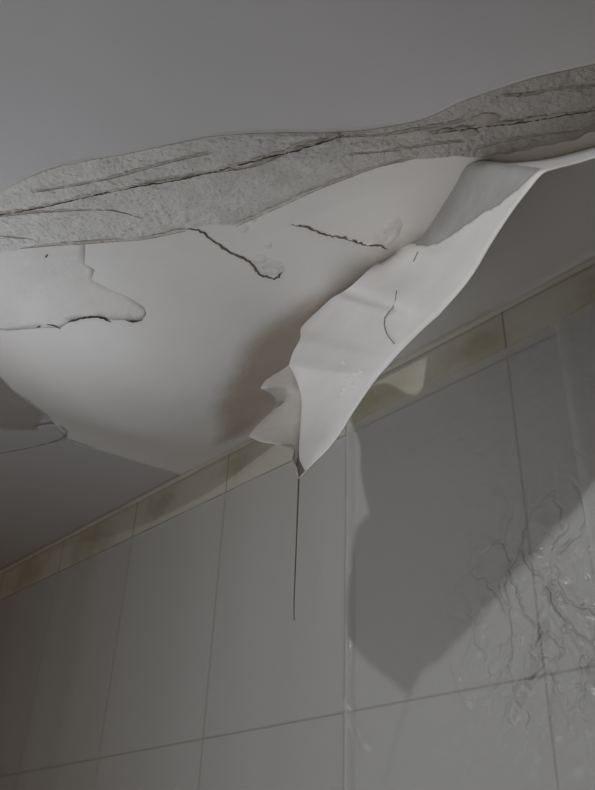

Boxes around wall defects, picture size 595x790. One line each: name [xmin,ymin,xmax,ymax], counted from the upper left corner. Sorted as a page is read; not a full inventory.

peeling [0,60,595,620]